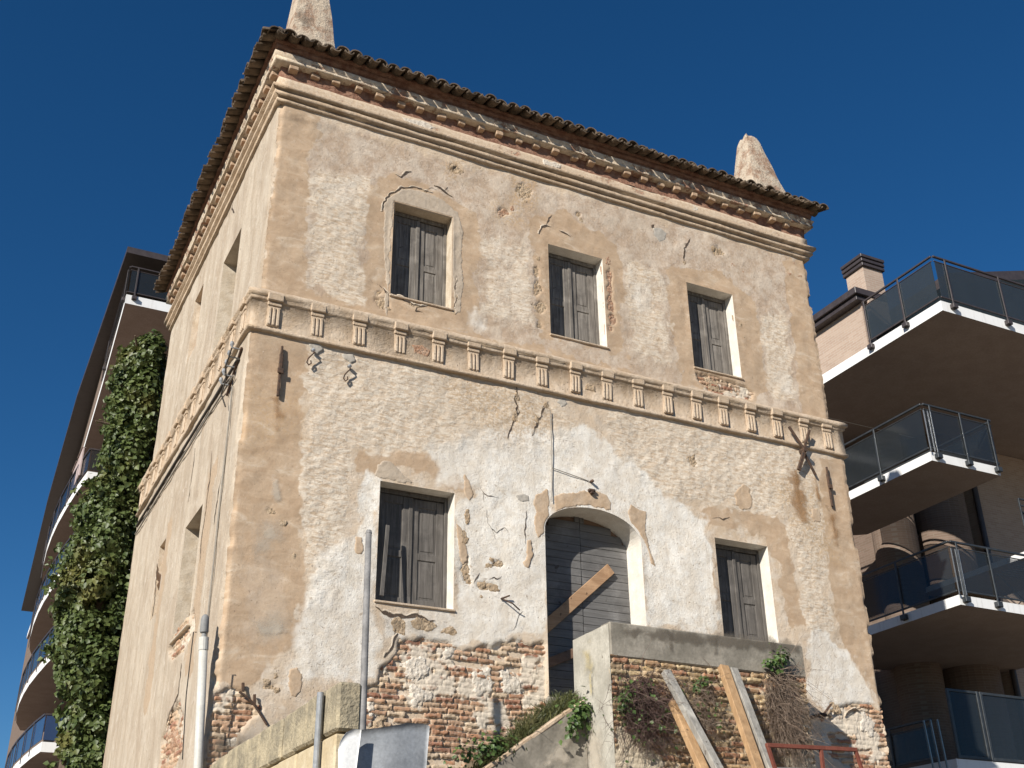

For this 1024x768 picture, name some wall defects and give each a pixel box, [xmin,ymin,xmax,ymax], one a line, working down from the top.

crack [380,170,453,211]
crack [538,215,570,236]
flaking render [600,256,616,334]
crack [508,387,549,437]
flaking render [456,474,500,598]
flaking render [485,557,503,568]
peeling [523,489,611,568]
peeling [628,505,655,566]
flaking render [161,702,184,768]
flaking render [206,688,262,768]
flaking render [366,637,546,768]
flaking render [820,702,891,768]